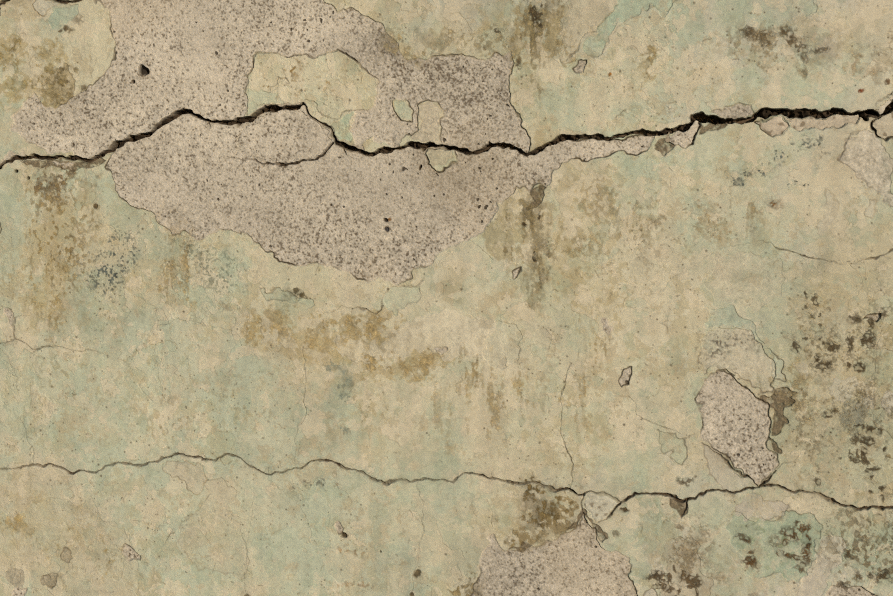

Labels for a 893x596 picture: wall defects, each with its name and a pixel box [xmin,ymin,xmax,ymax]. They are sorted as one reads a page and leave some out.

crack [53,0,82,8]
crack [565,0,677,62]
flaking render [0,0,789,285]
crack [0,49,893,169]
crack [323,274,425,315]
peeling [335,309,497,364]
crack [730,242,893,275]
flaking render [863,313,881,323]
crack [0,295,893,596]
flaking render [694,305,878,596]
peeling [828,348,893,494]
flaking render [469,494,714,596]